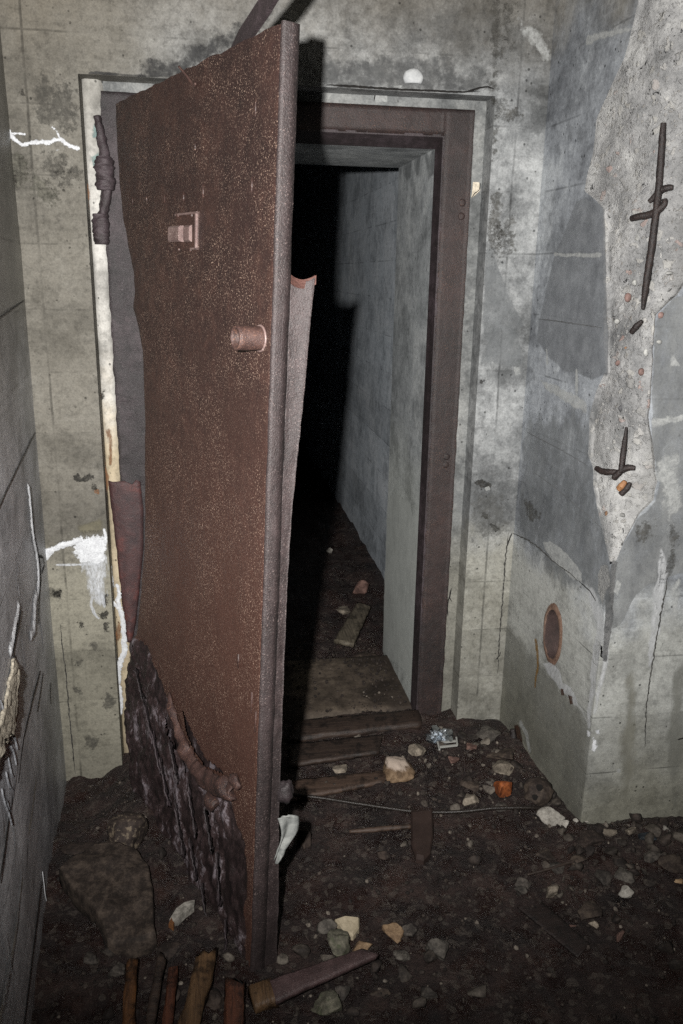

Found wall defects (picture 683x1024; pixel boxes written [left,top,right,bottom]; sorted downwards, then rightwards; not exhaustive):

crack [10,126,80,151]
spalling [585,0,683,661]
leakage [46,521,107,619]
crack [496,533,596,673]
spalling [0,656,21,844]
corrosion [133,667,214,855]